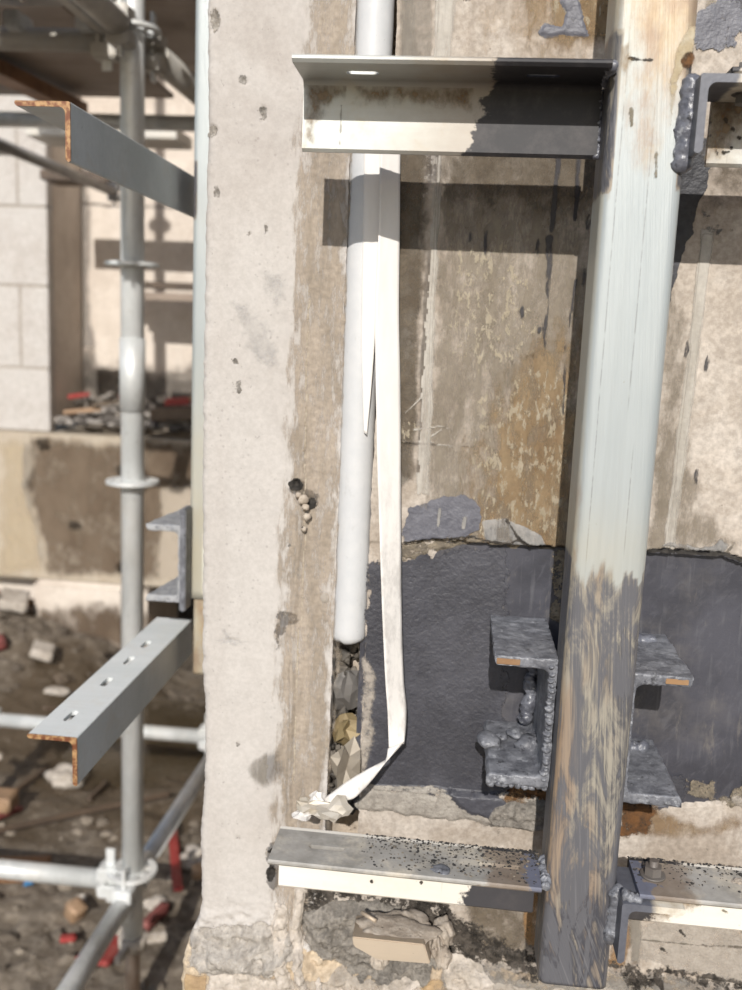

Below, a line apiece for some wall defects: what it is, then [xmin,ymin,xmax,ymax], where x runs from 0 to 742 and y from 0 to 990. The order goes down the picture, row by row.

leakage [402,0,417,56]
leakage [434,0,454,57]
leakage [399,154,595,494]
leakage [28,438,121,574]
leakage [144,440,191,580]
peeling [360,658,375,769]
rust [504,787,546,802]
rust [620,802,699,836]
rust [686,780,716,801]